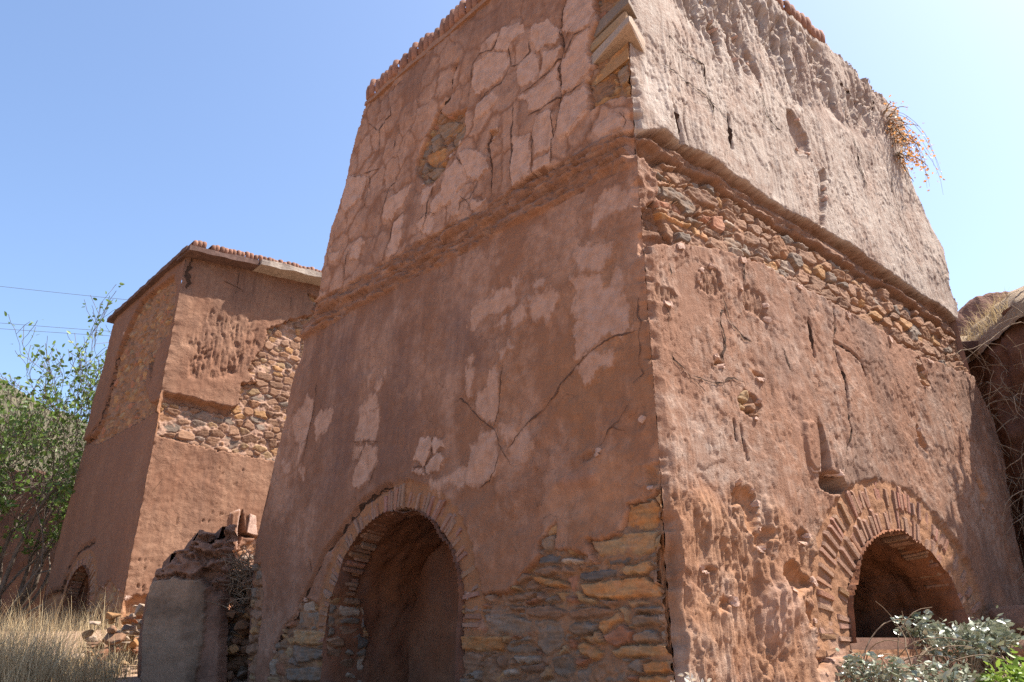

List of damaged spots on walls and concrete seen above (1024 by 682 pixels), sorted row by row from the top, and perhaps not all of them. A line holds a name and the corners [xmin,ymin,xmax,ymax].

crack [185,258,193,288]
spalling [95,281,336,485]
crack [353,83,433,260]
crack [440,2,590,209]
crack [451,298,644,487]
spalling [410,162,968,500]
crack [782,311,864,453]
spalling [459,459,676,682]